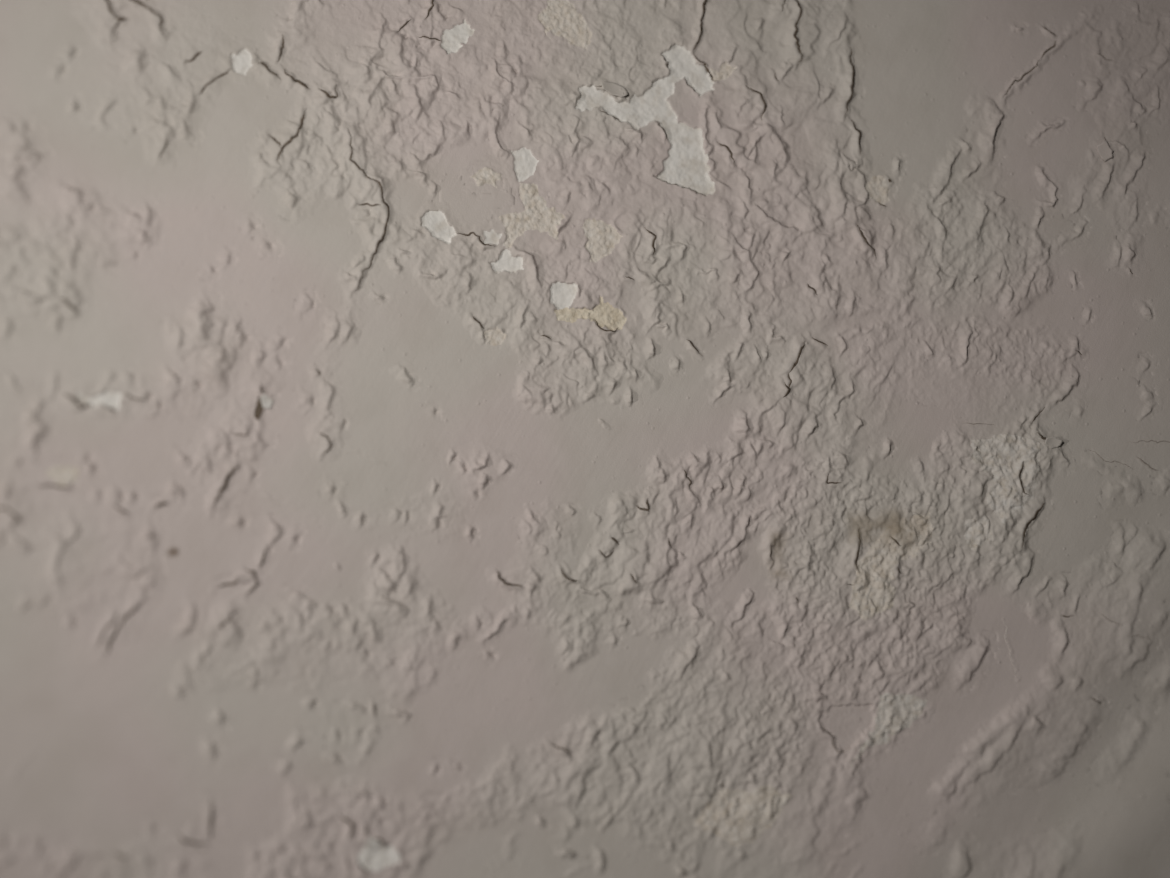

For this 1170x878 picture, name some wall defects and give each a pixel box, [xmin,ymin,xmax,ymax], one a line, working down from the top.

crack [409,29,444,47]
spalling [441,19,475,55]
crack [687,0,714,64]
crack [769,0,870,166]
spalling [575,43,737,196]
spalling [421,210,457,244]
flaking render [471,147,565,274]
crack [847,217,885,268]
flaking render [550,282,627,330]
flaking render [849,512,933,621]
flaking render [695,785,793,847]
spalling [357,837,400,872]